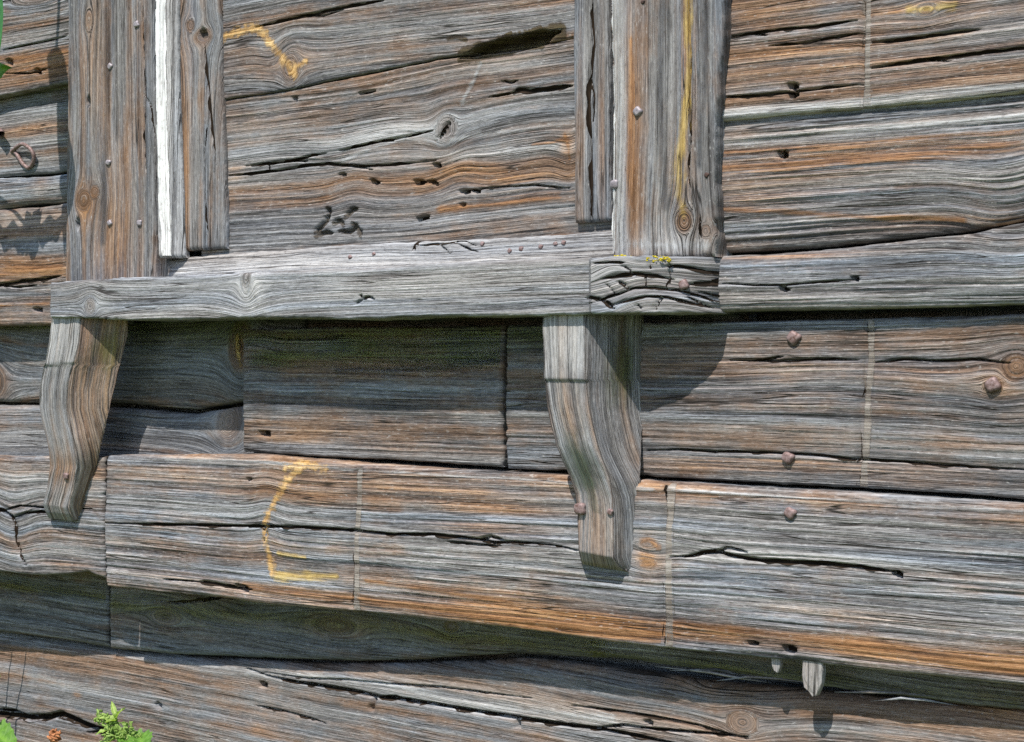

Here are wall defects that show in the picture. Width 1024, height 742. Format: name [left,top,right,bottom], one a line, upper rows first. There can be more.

crack [492,3,596,227]
crack [412,240,475,252]
crack [587,261,849,309]
crack [0,505,46,562]
crack [107,522,569,548]
crack [683,546,900,572]
crack [159,579,252,603]
crack [259,671,747,742]